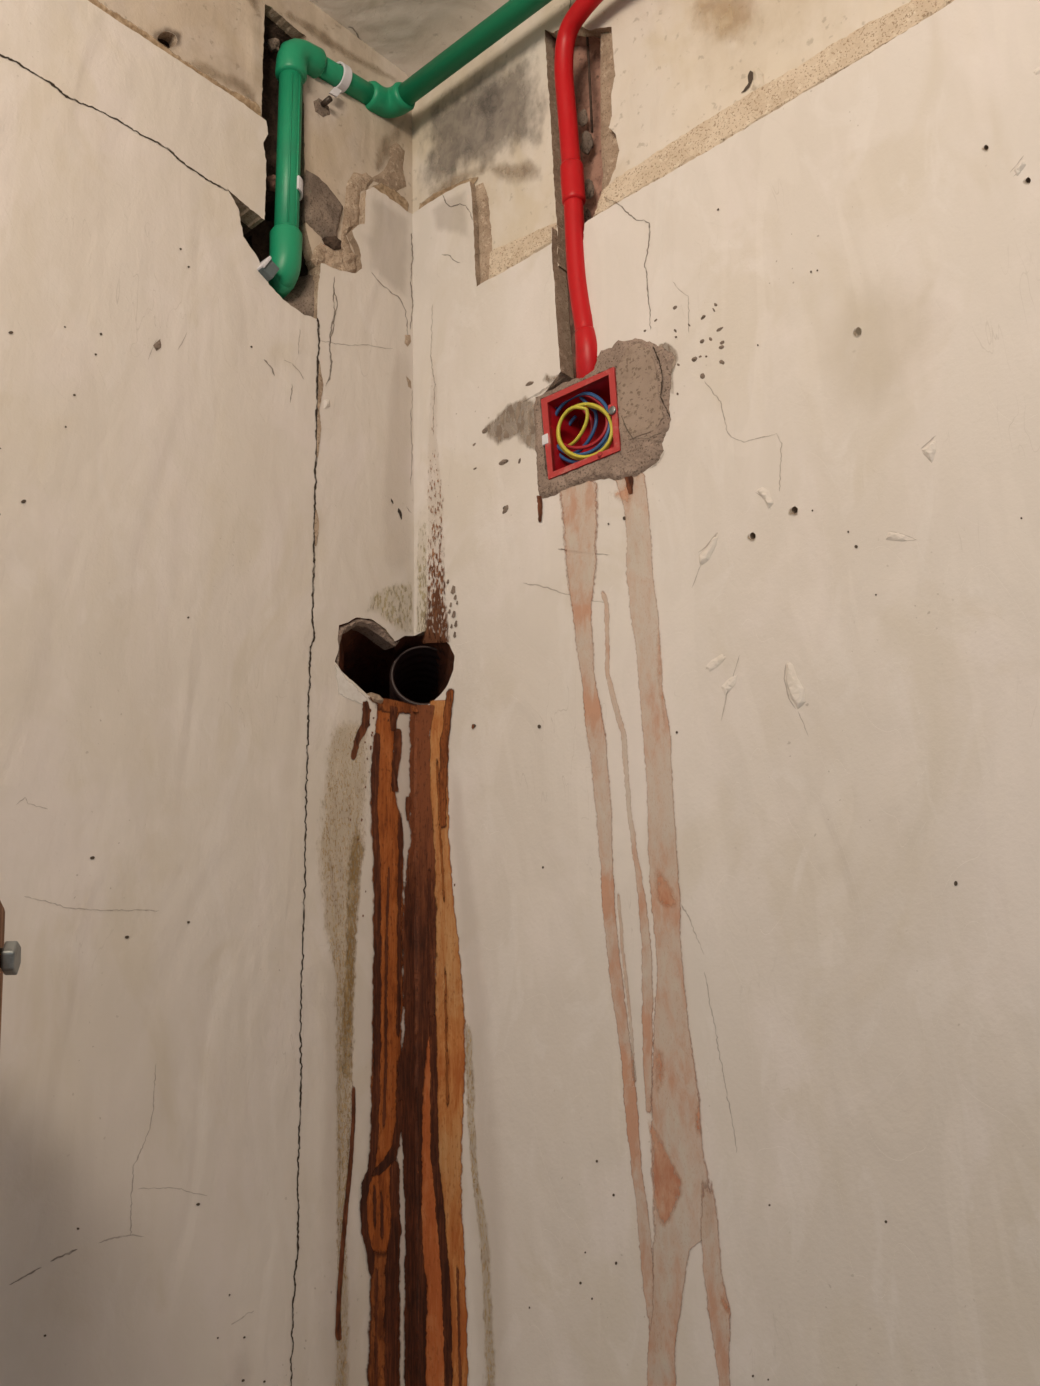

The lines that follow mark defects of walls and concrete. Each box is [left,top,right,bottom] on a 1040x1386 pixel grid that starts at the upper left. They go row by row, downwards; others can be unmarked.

crack [0,54,228,191]
leakage [430,67,531,189]
flaking render [573,0,954,224]
rust [423,453,458,643]
spalling [335,618,455,705]
crack [265,277,338,1386]
rust [560,473,731,1386]
rust [335,688,468,1386]
crack [10,1249,77,1285]